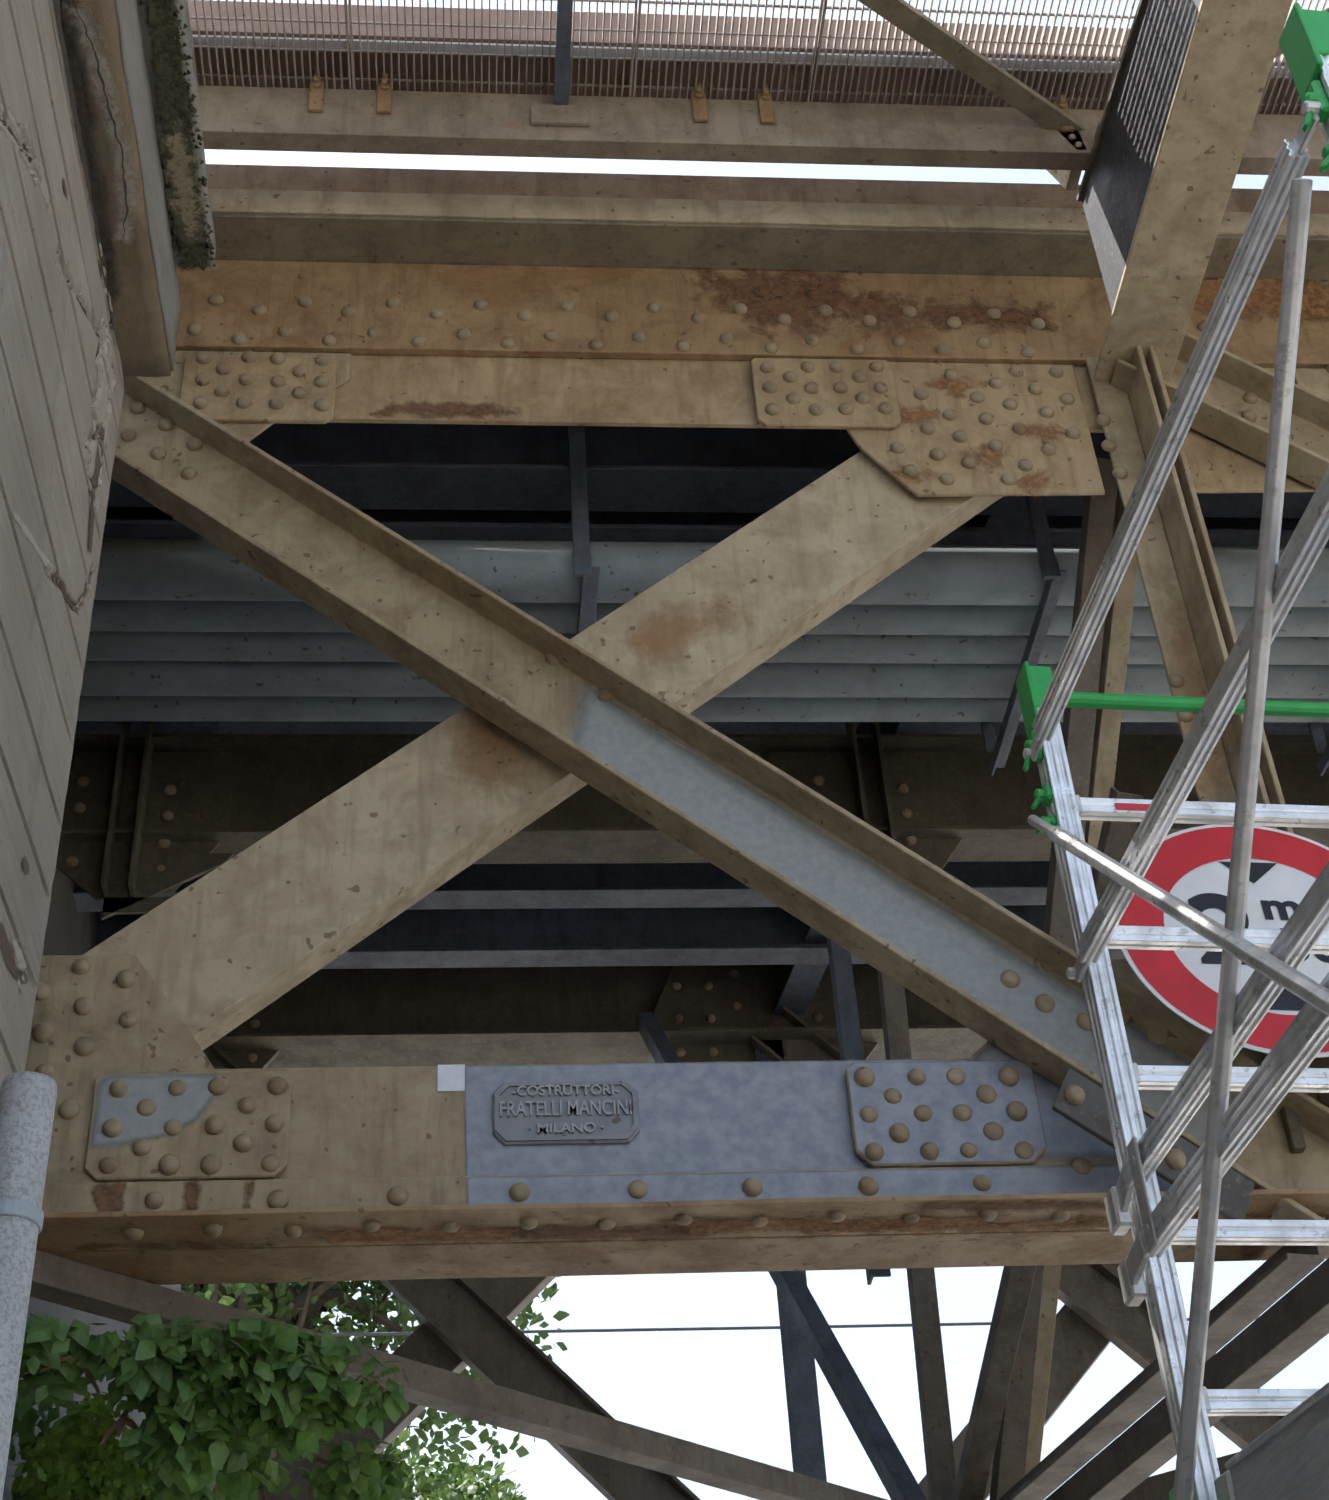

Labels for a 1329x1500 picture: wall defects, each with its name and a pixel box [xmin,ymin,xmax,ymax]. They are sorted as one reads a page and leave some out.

crack [65,3,139,243]
crack [0,103,49,214]
corrosion [688,267,1050,339]
corrosion [370,401,515,418]
corrosion [926,378,987,397]
spalling [12,939,27,993]
corrosion [92,1181,126,1212]
corrosion [184,1180,199,1210]